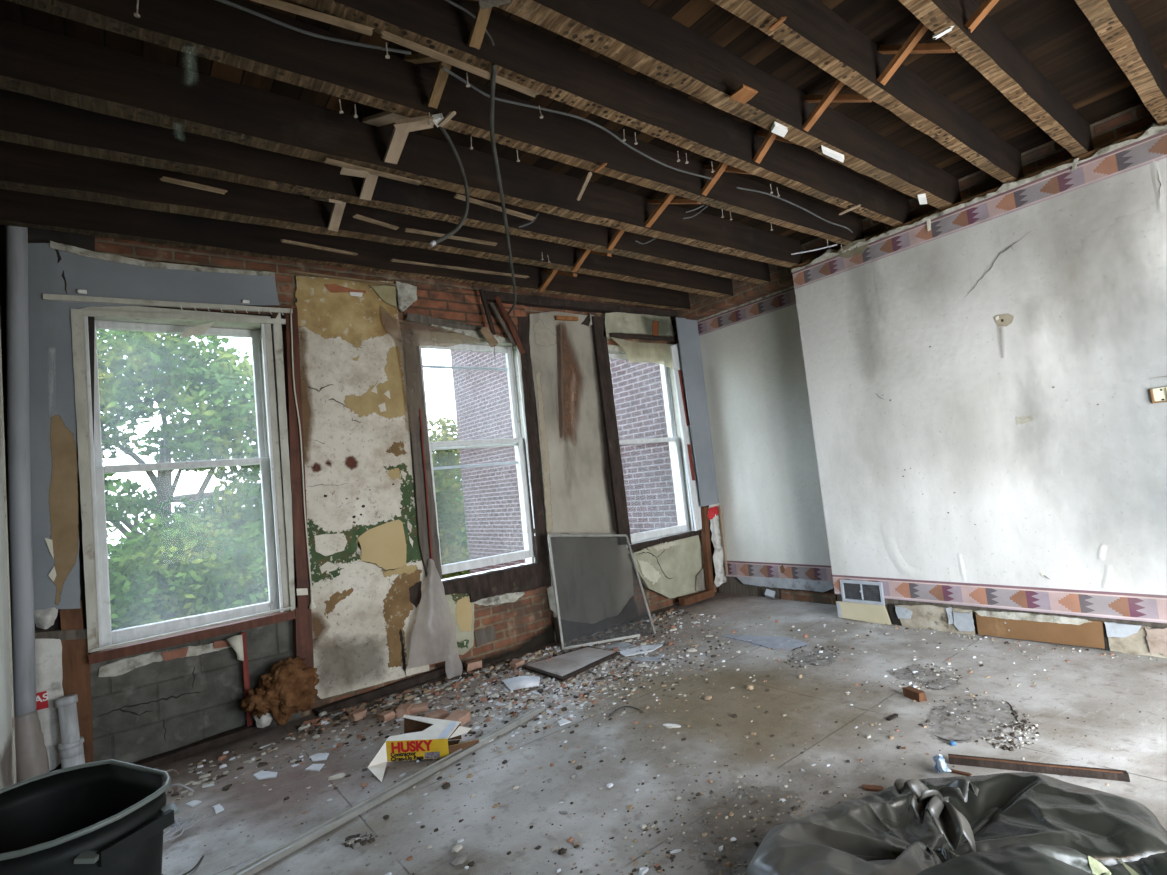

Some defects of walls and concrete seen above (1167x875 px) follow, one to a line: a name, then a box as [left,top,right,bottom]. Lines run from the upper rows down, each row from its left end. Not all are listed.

spalling [28,228,95,252]
crack [964,231,1031,298]
spalling [0,225,11,608]
peeling [294,275,407,419]
peeling [35,415,87,631]
peeling [307,441,422,668]
flaking render [459,586,560,672]
spalling [974,610,1091,625]